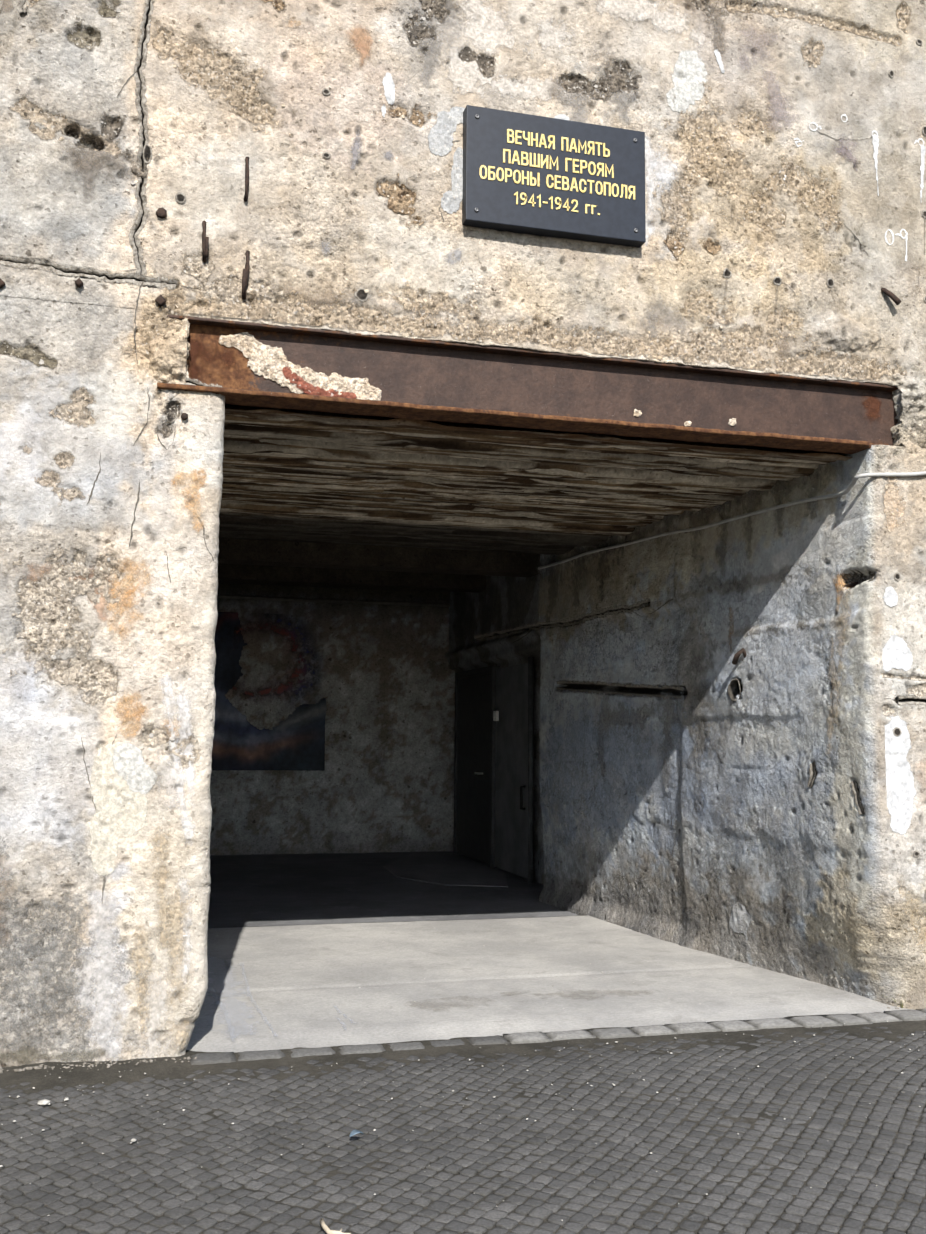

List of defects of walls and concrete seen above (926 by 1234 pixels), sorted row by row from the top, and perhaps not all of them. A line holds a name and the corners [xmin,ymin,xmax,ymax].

spalling [144,22,291,136]
spalling [263,0,286,10]
spalling [396,0,495,79]
spalling [559,59,642,101]
crack [0,0,193,450]
spalling [376,173,426,227]
spalling [113,250,907,381]
rust [187,336,235,379]
spalling [4,547,124,706]